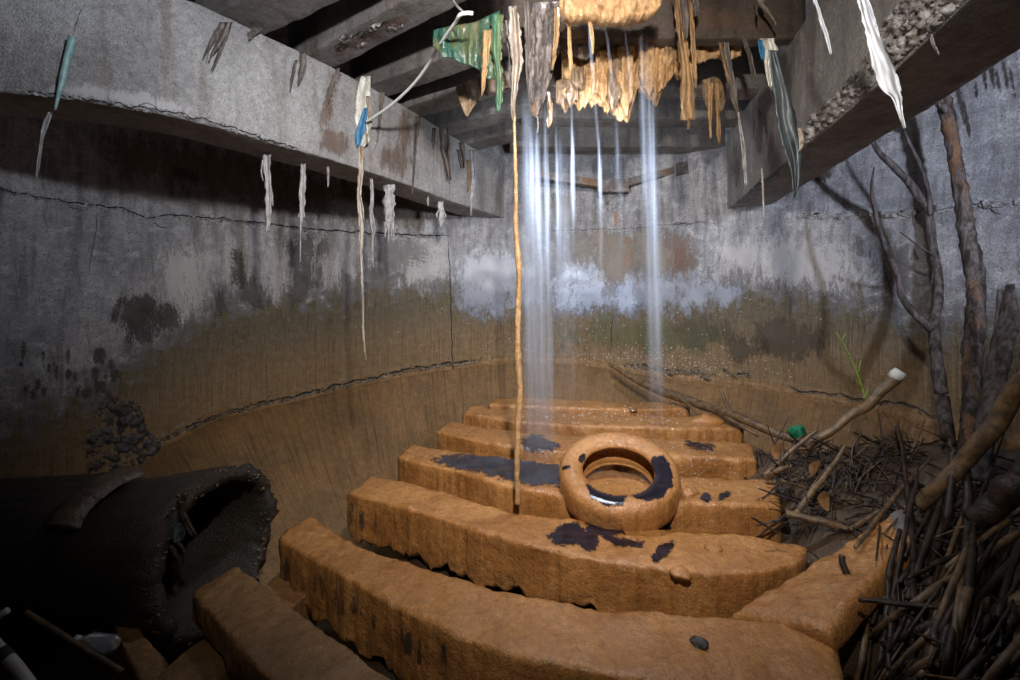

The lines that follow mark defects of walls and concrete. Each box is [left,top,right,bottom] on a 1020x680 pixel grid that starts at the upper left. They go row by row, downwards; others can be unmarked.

crack [16,90,298,150]
crack [0,187,482,445]
water stain [103,129,434,345]
water stain [371,193,912,363]